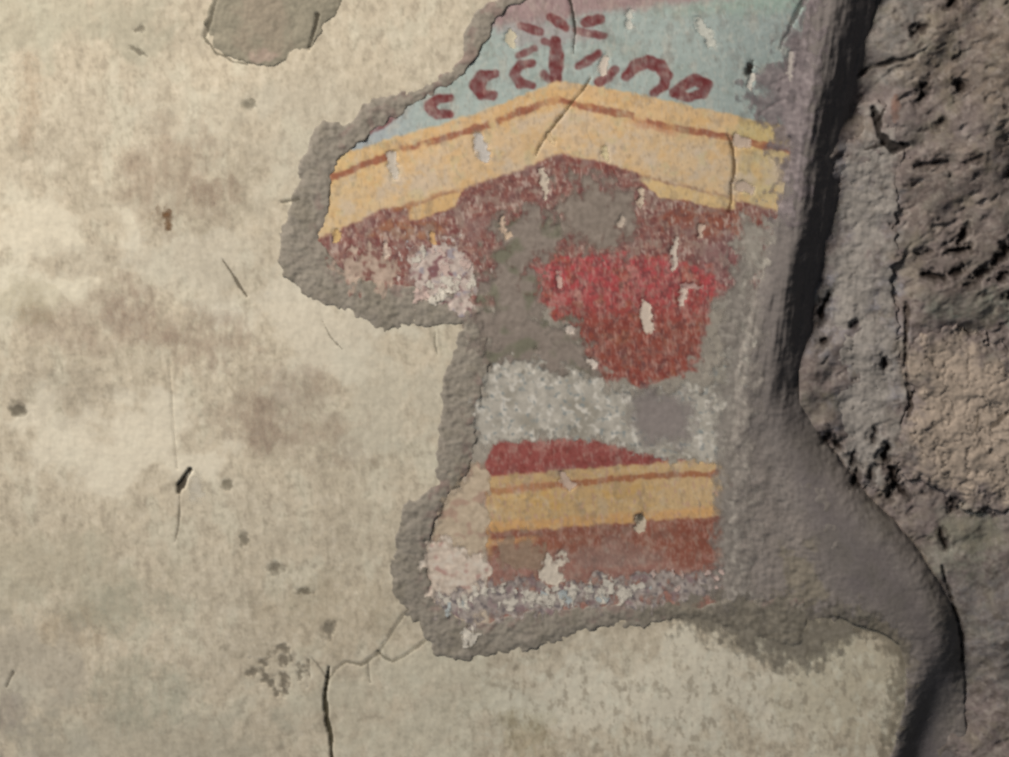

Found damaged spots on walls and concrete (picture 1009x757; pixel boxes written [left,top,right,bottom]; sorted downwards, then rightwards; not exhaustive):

crack [568,0,576,49]
peeling [696,17,715,47]
peeling [598,55,609,76]
peeling [786,51,794,82]
crack [536,78,590,155]
peeling [473,133,491,163]
spalling [331,168,775,465]
spalling [418,461,725,648]
crack [324,667,334,757]